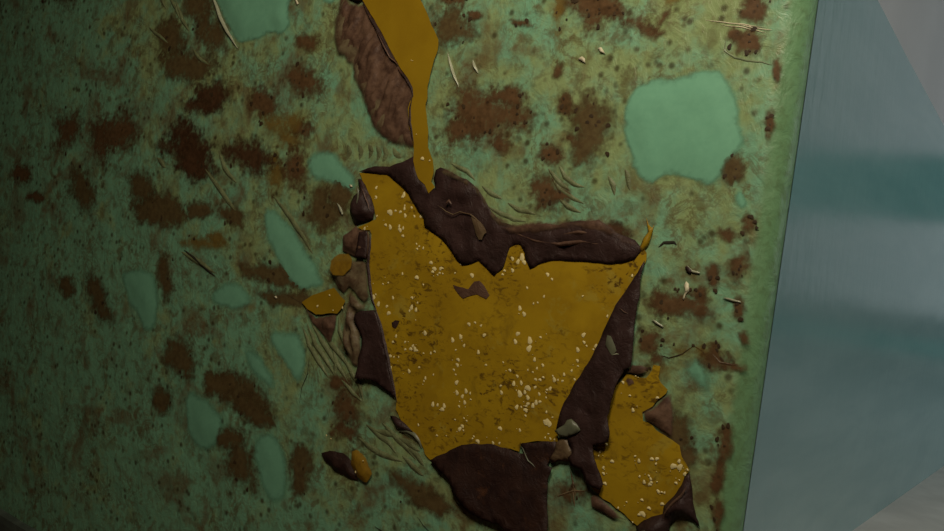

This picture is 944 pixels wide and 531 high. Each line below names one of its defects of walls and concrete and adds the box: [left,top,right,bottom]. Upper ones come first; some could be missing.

rust [563,0,670,39]
rust [727,0,771,55]
rust [773,60,782,82]
rust [445,81,535,155]
rust [558,92,578,116]
rust [765,114,775,138]
peeling [302,0,700,531]
rust [649,256,749,319]
rust [734,298,748,344]
rust [700,340,745,372]